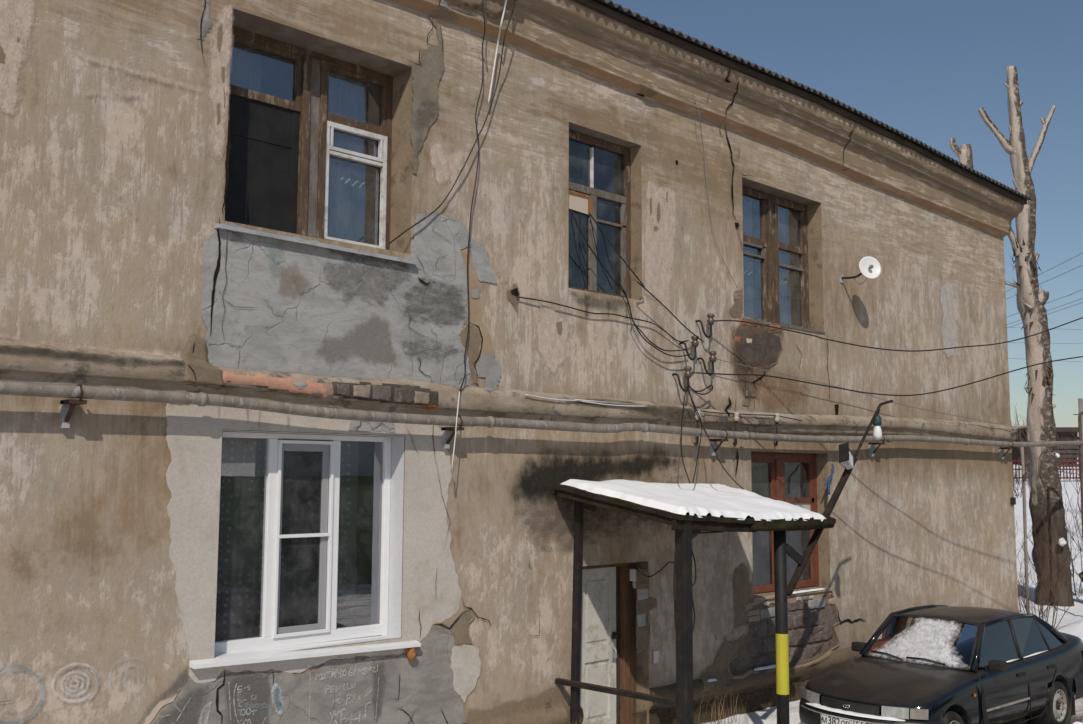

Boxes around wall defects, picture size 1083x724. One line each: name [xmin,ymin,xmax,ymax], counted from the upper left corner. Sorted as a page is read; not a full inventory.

peeling [0,0,34,114]
crack [197,0,212,59]
crack [408,0,449,66]
crack [210,92,231,335]
crack [707,70,753,249]
spalling [222,371,438,408]
peeling [460,252,502,391]
spalling [703,290,783,427]
water stain [523,461,653,493]
peeling [145,670,188,724]
spalling [432,602,568,724]
spalling [701,565,840,693]